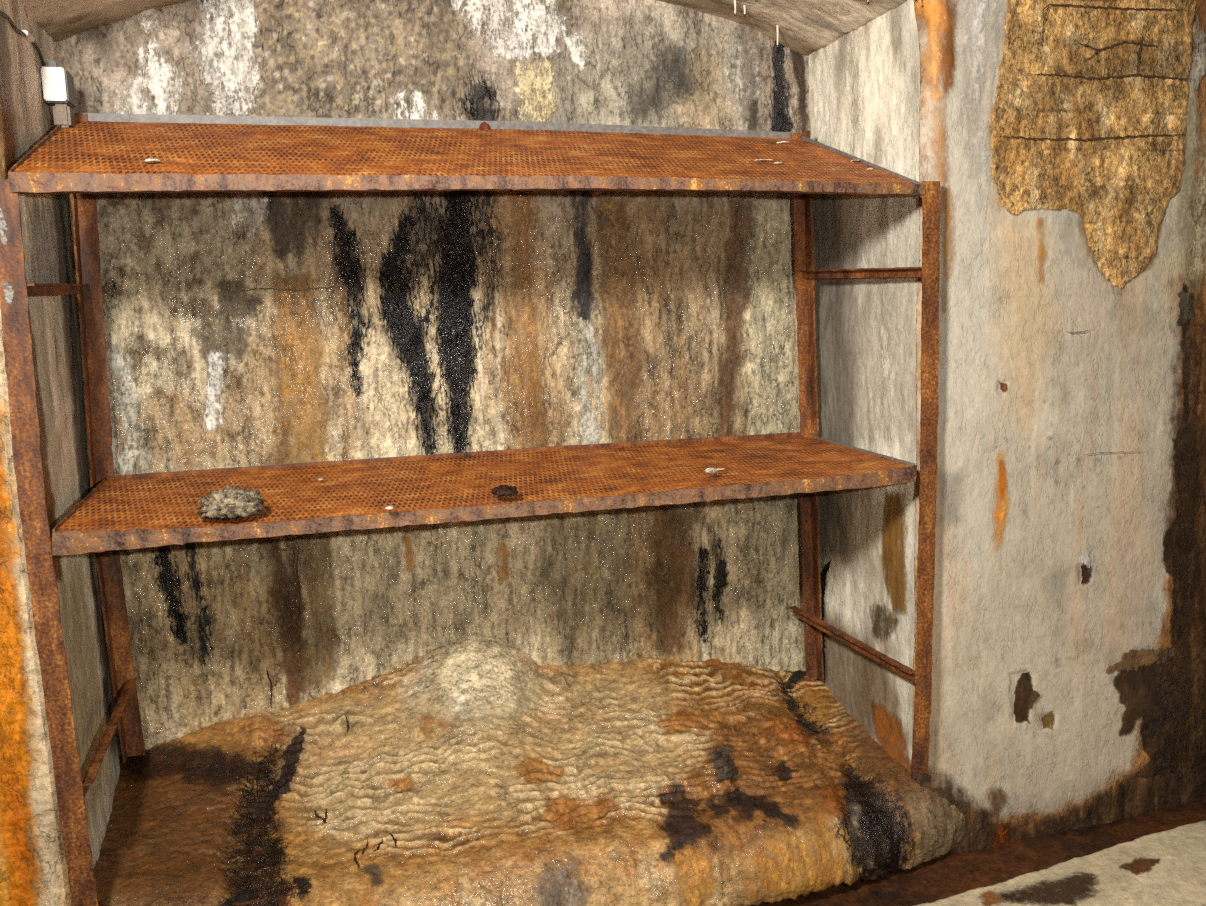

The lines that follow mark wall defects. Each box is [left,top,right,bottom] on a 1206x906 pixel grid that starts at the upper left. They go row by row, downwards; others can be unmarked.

leakage [451,0,587,122]
leakage [718,35,809,132]
rust [914,0,956,277]
peeling [989,0,1196,288]
rust [0,409,40,906]
rust [32,337,63,581]
leakage [152,542,213,666]
rust [274,276,327,464]
leakage [229,190,502,455]
rust [994,455,1008,546]
spalling [1014,672,1054,729]
leakage [911,28,1206,859]